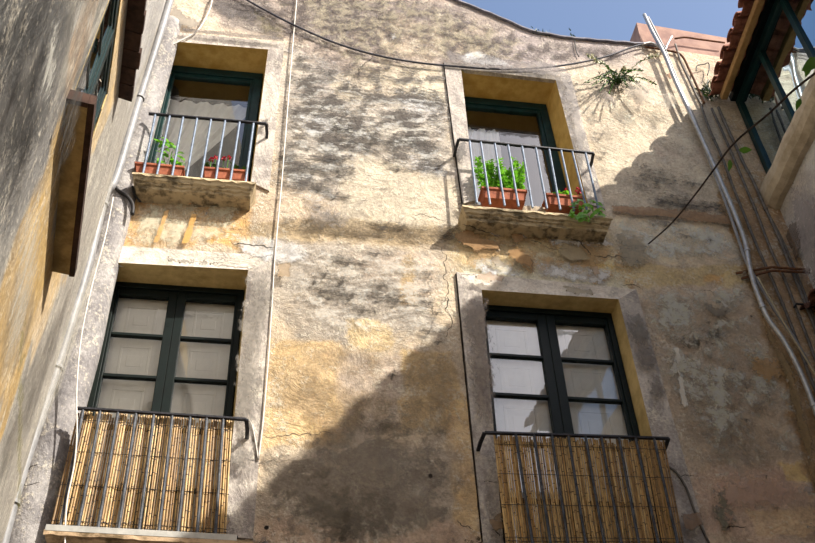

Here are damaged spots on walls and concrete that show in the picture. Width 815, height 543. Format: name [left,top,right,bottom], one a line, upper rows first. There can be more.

water stain [462,51,496,59]
water stain [275,45,452,238]
water stain [313,248,404,314]
peeling [455,229,636,289]
water stain [231,272,273,472]
crack [264,431,332,439]
crack [441,248,500,542]
peeling [670,352,795,440]
water stain [262,456,417,543]